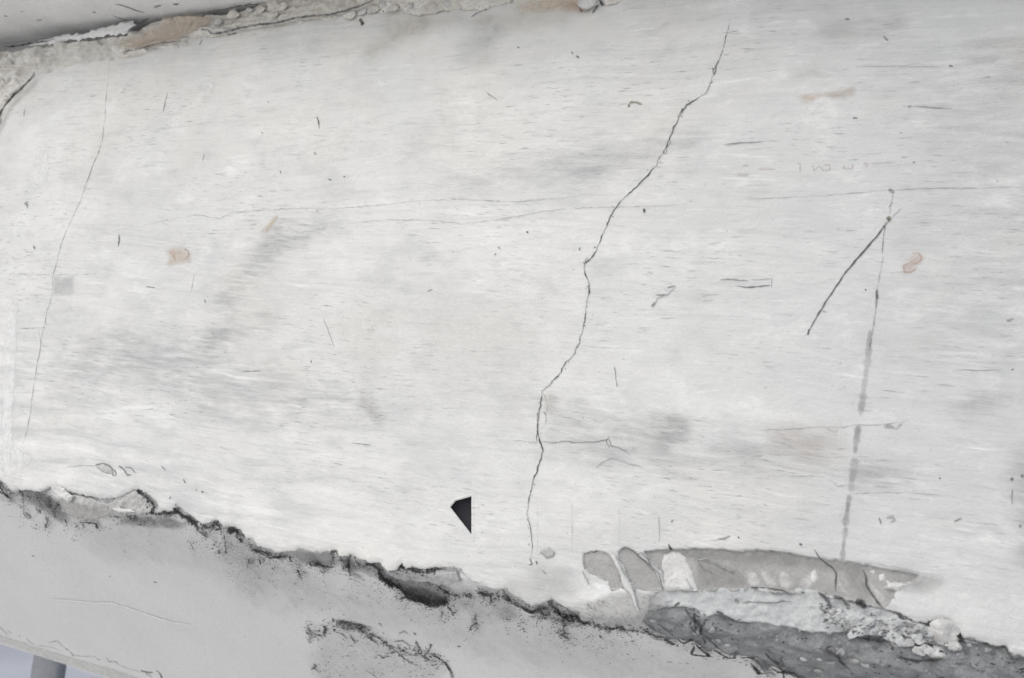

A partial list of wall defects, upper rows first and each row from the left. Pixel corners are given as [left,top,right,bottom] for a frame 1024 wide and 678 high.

crack [518,35,727,548]
crack [807,203,900,335]
spalling [0,482,1024,678]